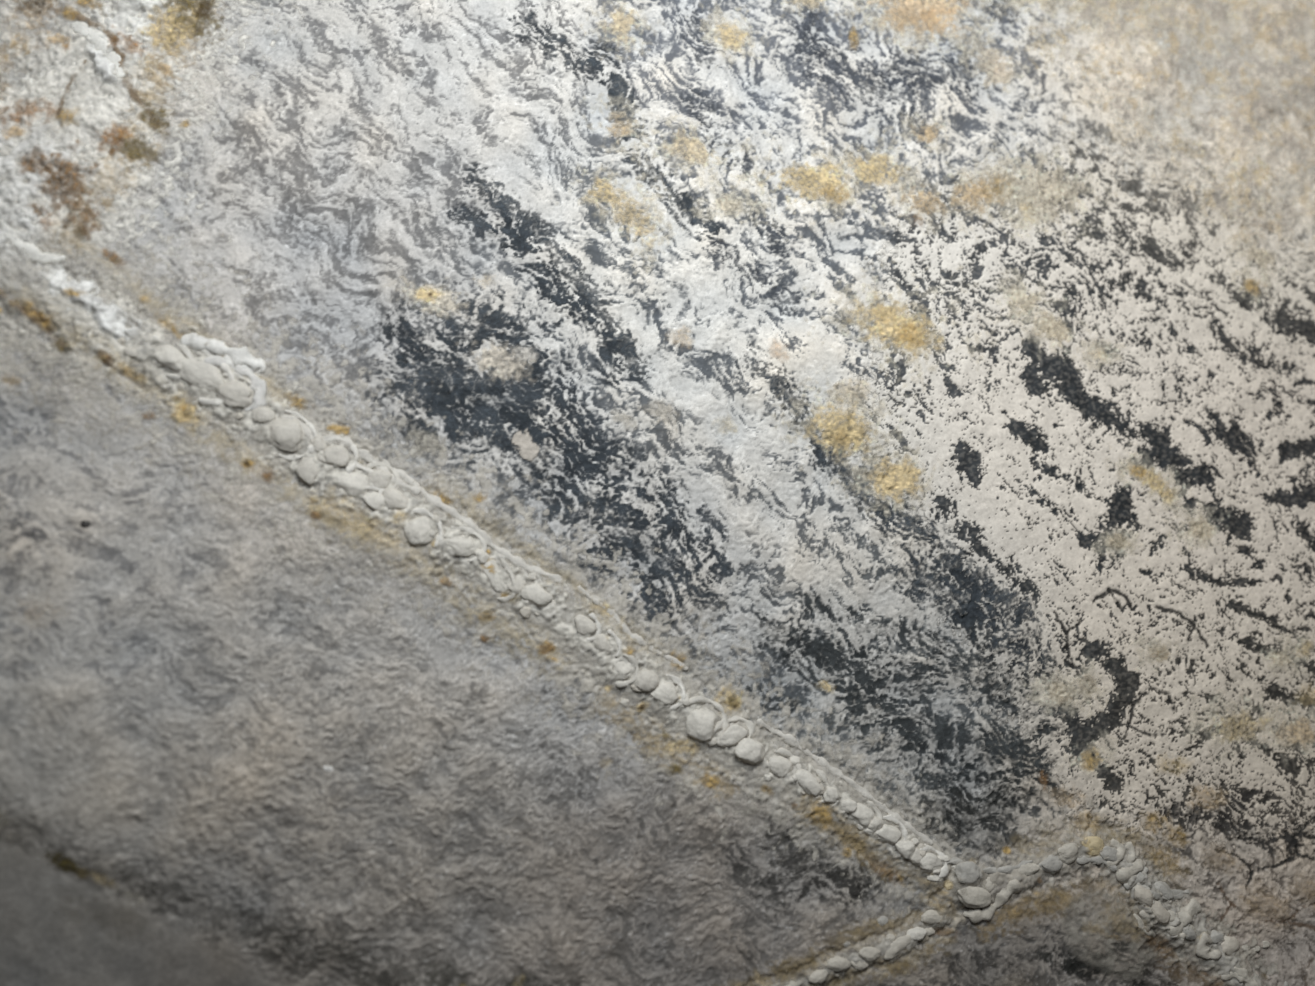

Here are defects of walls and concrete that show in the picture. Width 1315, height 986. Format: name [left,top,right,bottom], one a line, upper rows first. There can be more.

water stain [509,10,799,312]
water stain [373,164,733,624]
crack [603,547,622,575]
water stain [738,344,1066,842]
crack [1054,588,1209,678]
crack [780,702,790,716]
crack [1119,687,1176,746]
water stain [762,835,881,898]
water stain [1164,790,1315,855]
crack [1215,816,1315,887]
crack [1266,904,1315,929]
water stain [1062,941,1140,986]